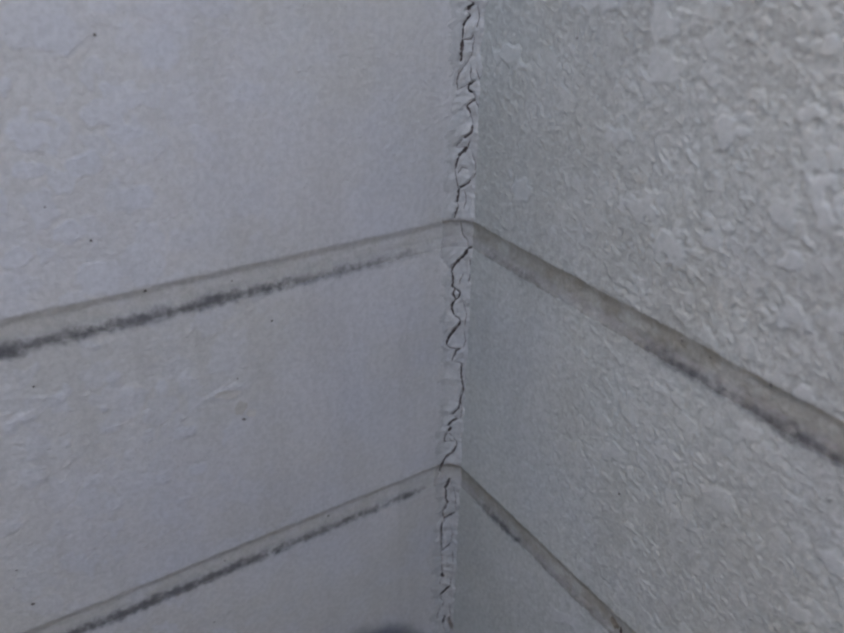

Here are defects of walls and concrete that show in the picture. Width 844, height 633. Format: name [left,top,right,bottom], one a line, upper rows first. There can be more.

crack [436,0,480,633]